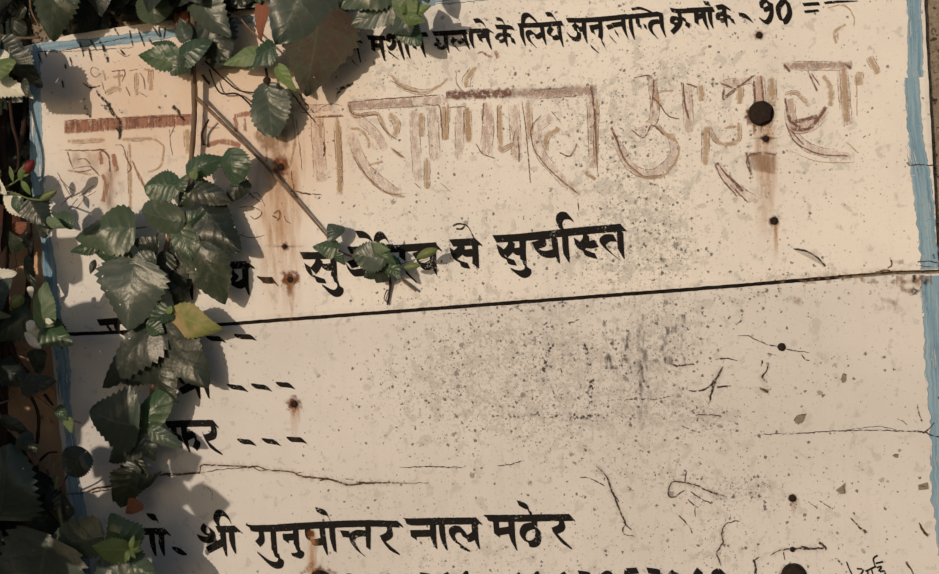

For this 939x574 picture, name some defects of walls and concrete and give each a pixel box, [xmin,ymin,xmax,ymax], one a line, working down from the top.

rust [256,130,288,175]
rust [282,272,299,292]
crack [765,406,939,437]
crack [77,486,111,494]
crack [160,464,427,486]
crack [580,468,633,536]